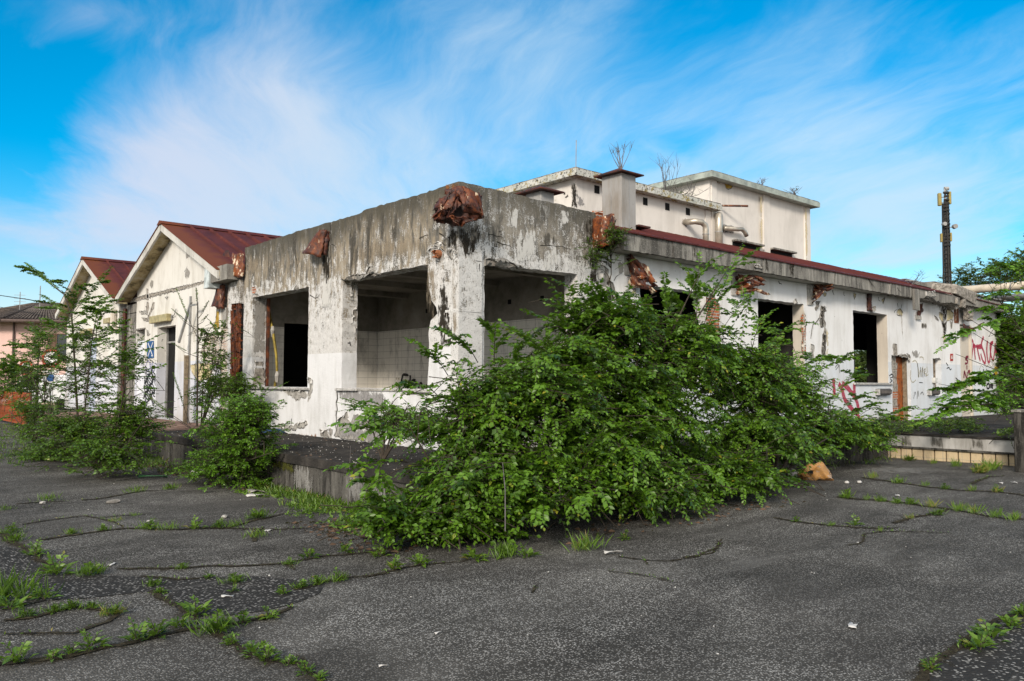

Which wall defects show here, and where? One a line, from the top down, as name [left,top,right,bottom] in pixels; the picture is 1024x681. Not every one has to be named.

damp [561,184,584,224]
damp [447,225,483,257]
damp [509,208,559,270]
corrosion [222,250,245,278]
damp [428,271,452,345]
flaking render [704,295,722,338]
peeling [279,377,313,402]
peeling [277,411,383,444]
crack [773,475,1023,545]
crack [609,539,723,582]
crack [0,490,471,681]
crack [907,608,1020,681]